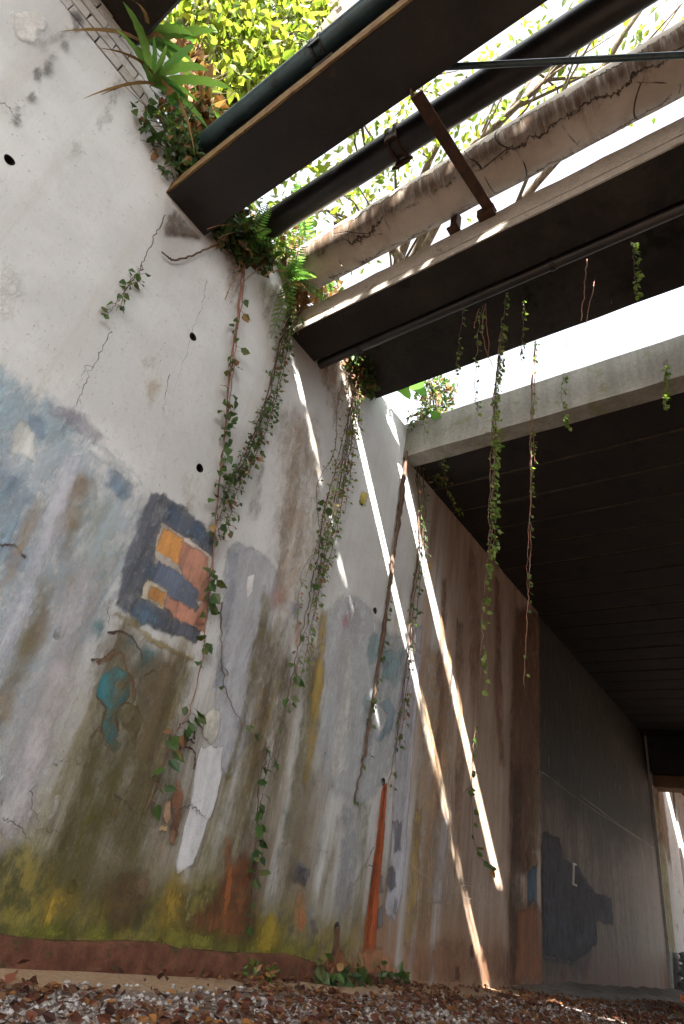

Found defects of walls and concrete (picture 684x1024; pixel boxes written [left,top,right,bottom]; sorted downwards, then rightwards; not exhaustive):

crack [71,331,112,422]
water stain [0,457,94,836]
water stain [259,647,315,802]
water stain [290,855,310,886]
rust [324,783,397,974]